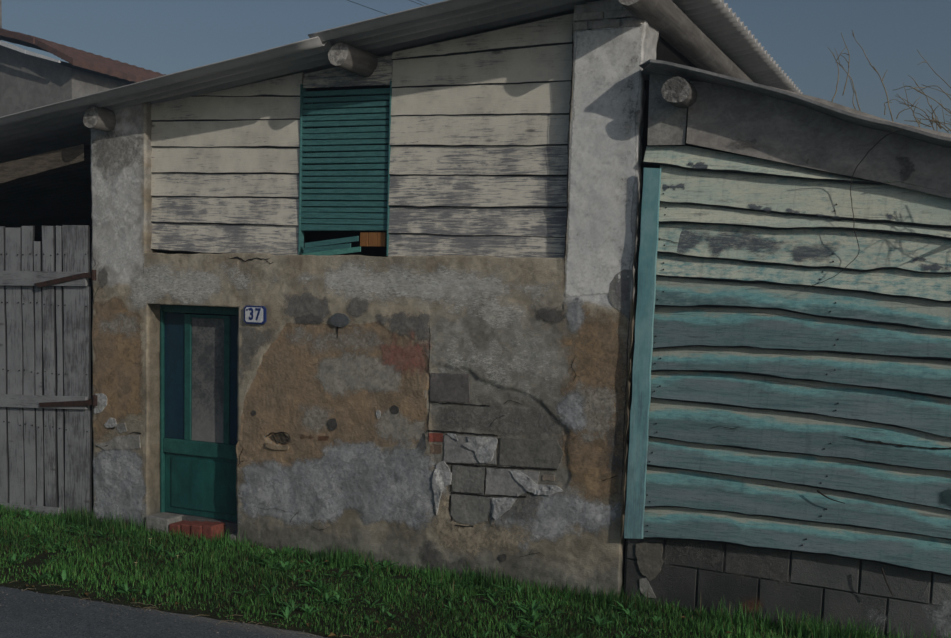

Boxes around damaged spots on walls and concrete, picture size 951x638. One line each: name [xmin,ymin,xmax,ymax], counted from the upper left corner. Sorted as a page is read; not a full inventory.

peeling [677,229,838,262]
peeling [510,269,632,498]
peeling [236,321,498,515]
peeling [491,497,517,520]
spalling [635,542,663,598]